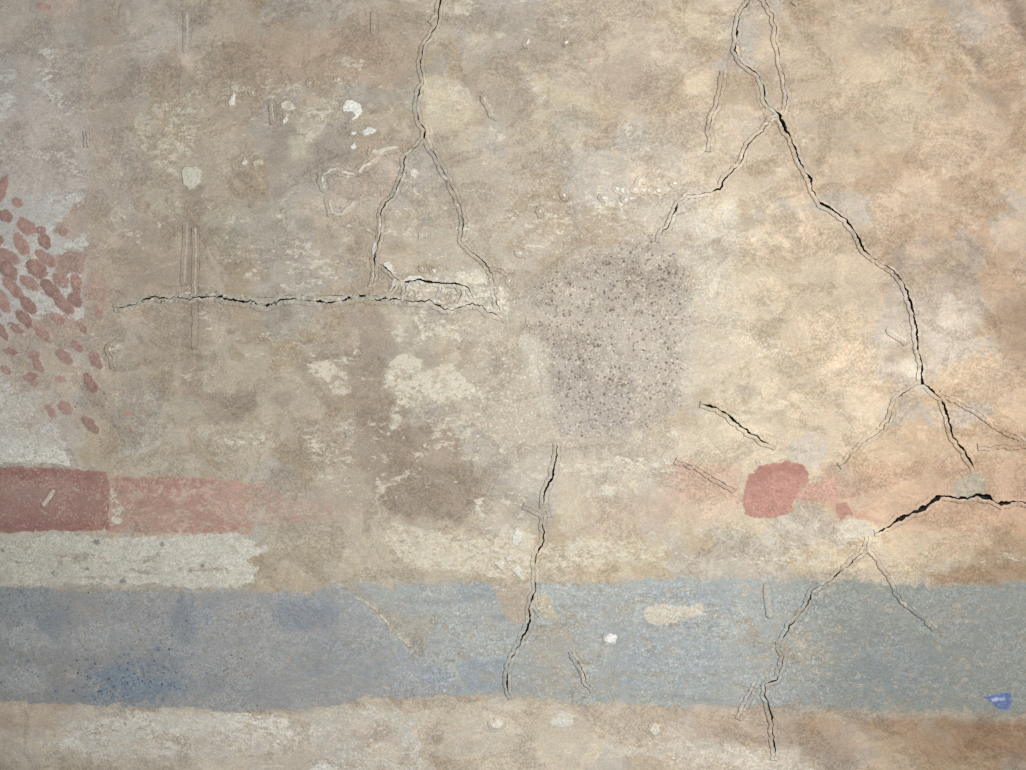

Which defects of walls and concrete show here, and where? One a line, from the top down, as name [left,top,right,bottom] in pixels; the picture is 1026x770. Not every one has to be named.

crack [113,0,514,322]
crack [655,0,1026,761]
crack [503,443,561,700]